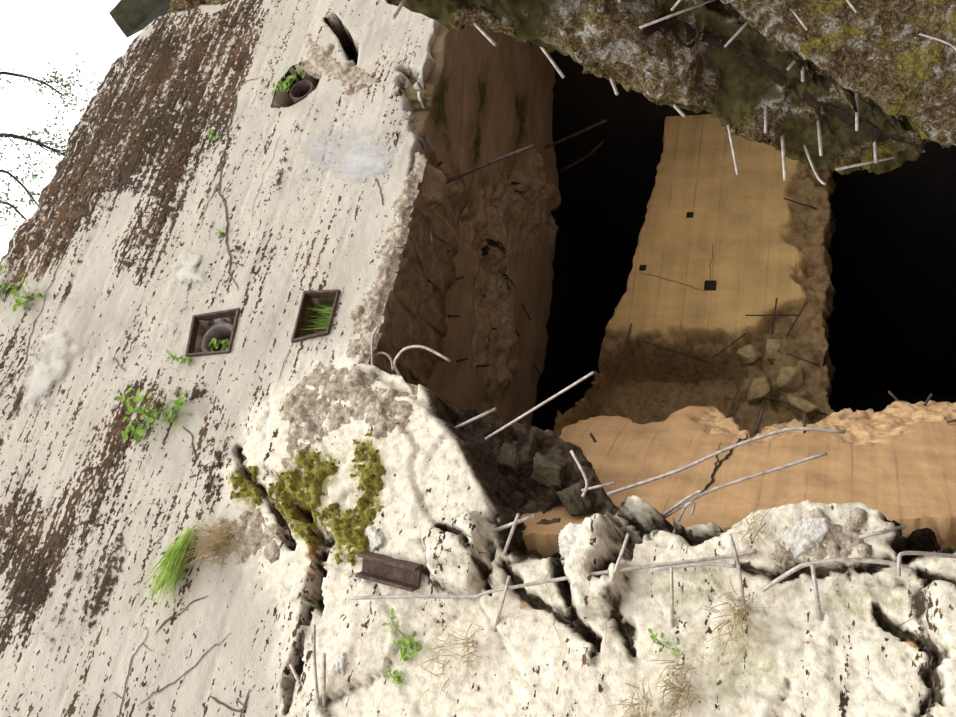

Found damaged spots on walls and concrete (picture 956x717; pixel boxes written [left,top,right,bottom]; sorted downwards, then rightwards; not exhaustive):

spalling [540,47,565,79]
damp [2,1,248,305]
spalling [804,120,827,186]
damp [0,316,56,445]
spalling [485,371,594,440]
damp [0,360,216,652]
damp [199,430,233,504]
crack [227,470,331,557]
spalling [570,410,845,497]
crack [436,526,632,660]
crack [743,558,883,582]
crack [875,609,935,717]